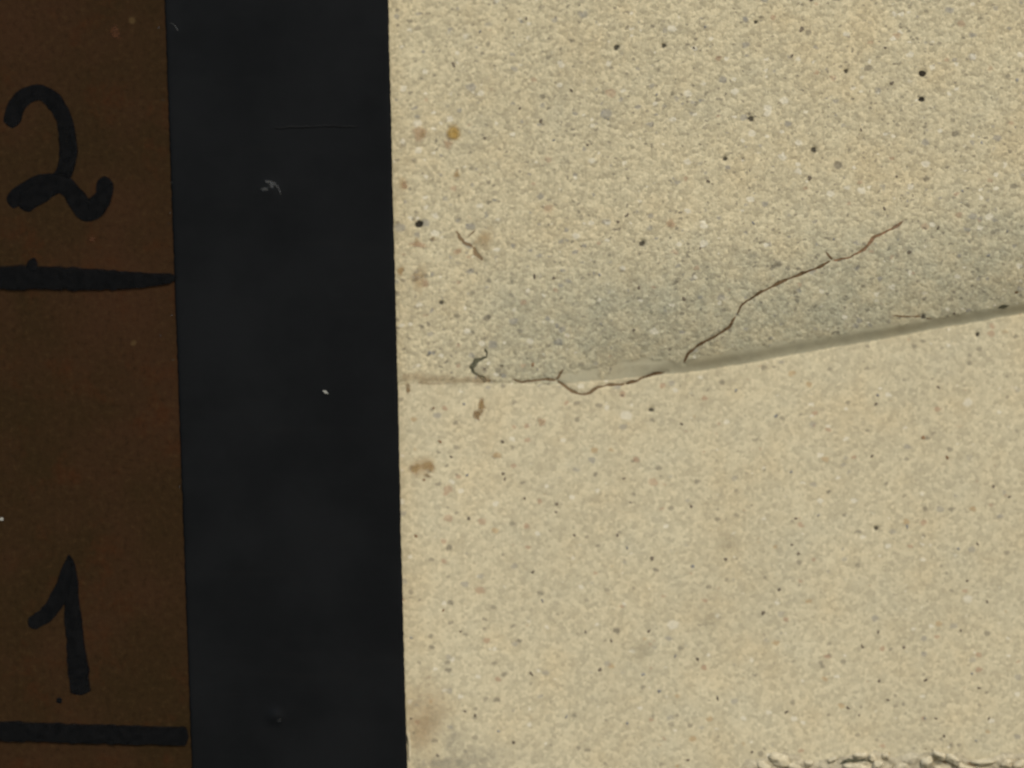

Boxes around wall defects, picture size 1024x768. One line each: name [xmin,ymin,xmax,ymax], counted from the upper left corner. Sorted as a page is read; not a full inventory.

crack [455,231,483,260]
crack [513,221,903,395]
crack [469,349,488,382]
spalling [741,749,1024,768]